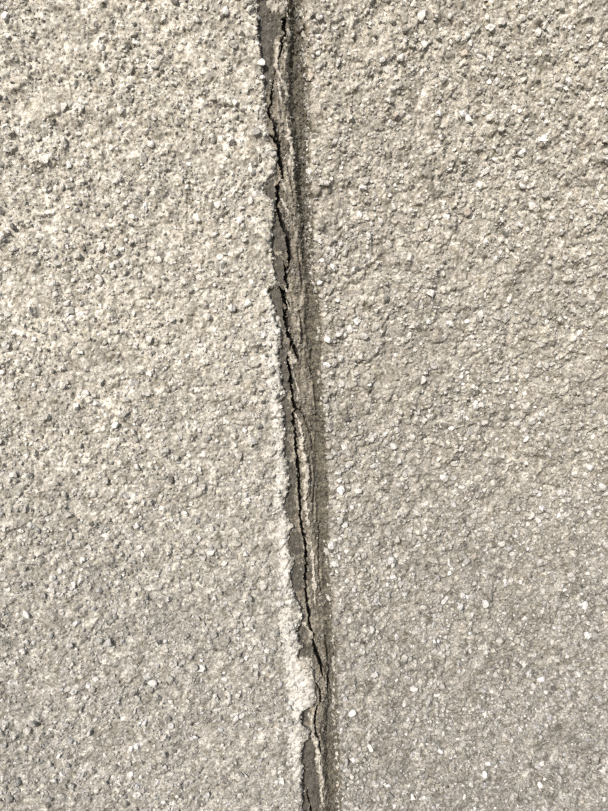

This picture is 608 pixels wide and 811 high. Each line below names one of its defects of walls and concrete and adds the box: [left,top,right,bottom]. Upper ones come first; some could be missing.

crack [267,0,329,748]